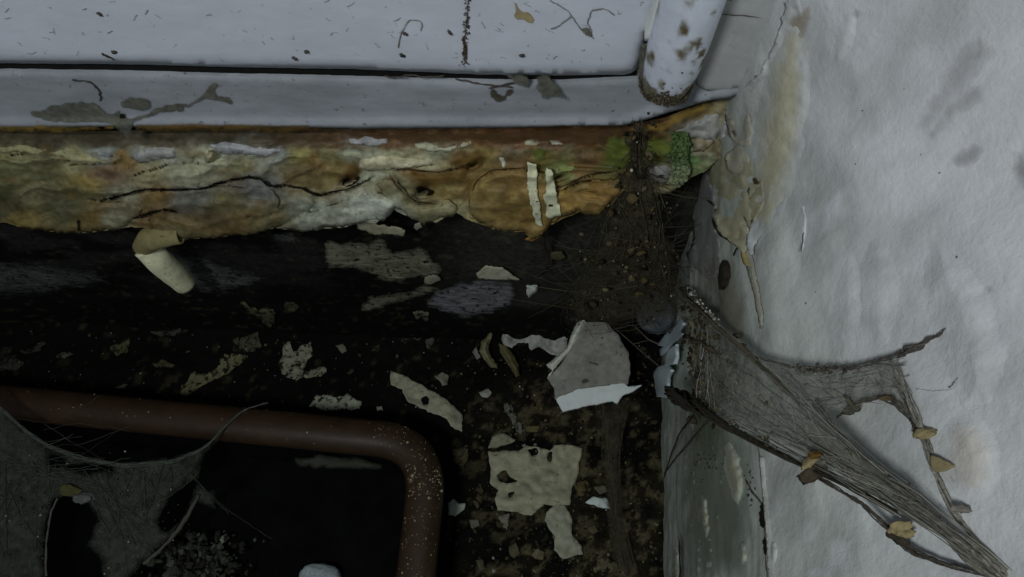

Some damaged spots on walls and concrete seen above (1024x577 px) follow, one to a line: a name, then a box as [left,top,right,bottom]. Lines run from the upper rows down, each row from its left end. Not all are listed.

crack [77,163,510,232]
peeling [0,0,802,329]
peeling [448,402,609,560]